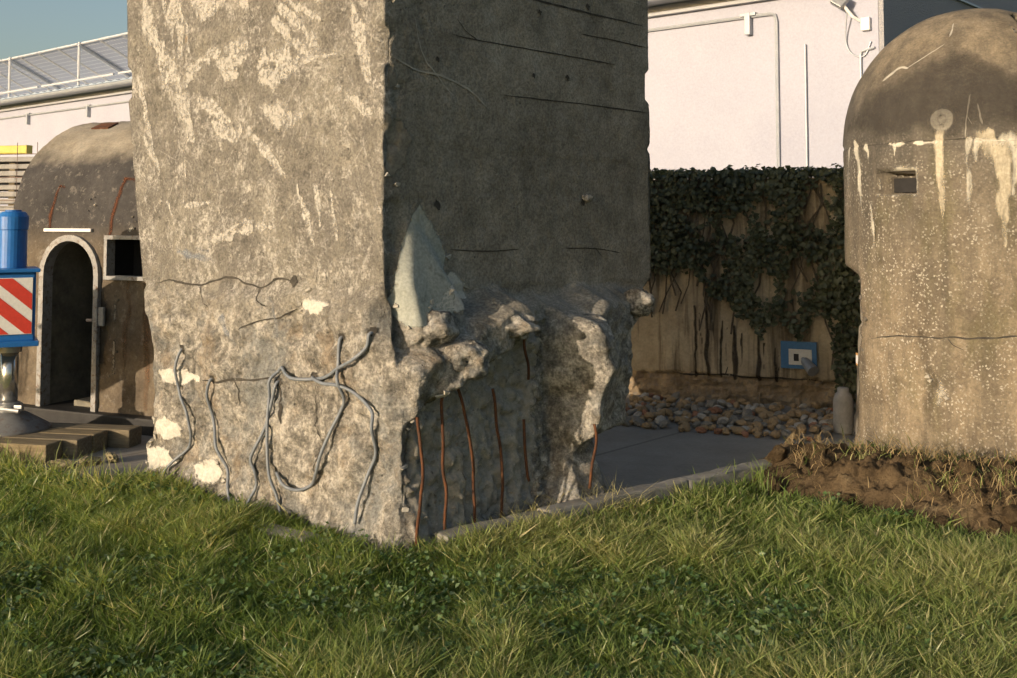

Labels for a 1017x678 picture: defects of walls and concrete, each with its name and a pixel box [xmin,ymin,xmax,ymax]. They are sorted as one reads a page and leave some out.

damp [848,140,875,236]
damp [866,59,1017,225]
crack [159,276,297,330]
spalling [387,204,470,330]
crack [871,335,1017,350]
spalling [400,332,543,547]